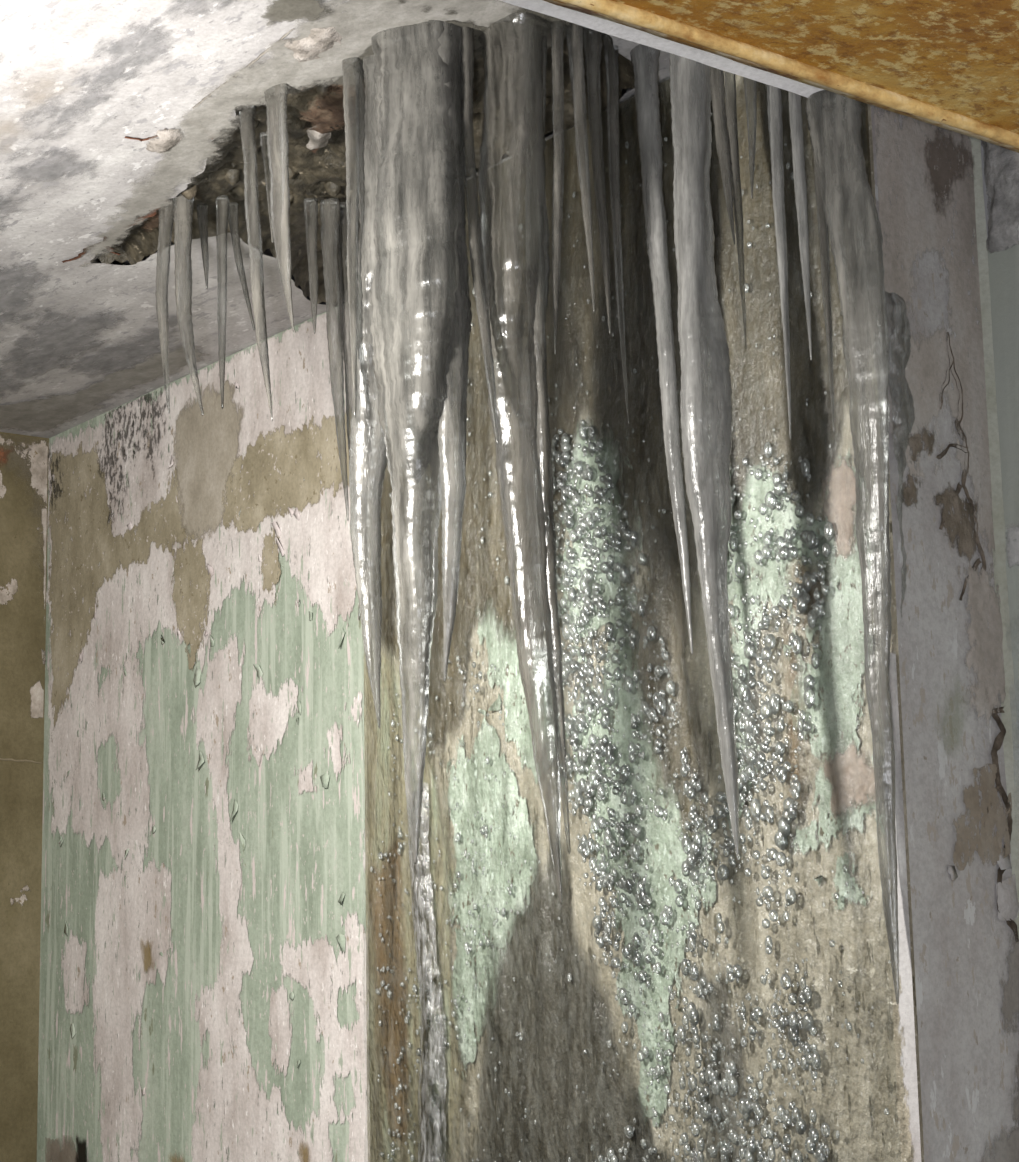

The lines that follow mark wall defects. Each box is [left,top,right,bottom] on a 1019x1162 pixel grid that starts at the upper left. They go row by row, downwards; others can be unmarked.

damp [80,0,578,267]
spalling [457,23,634,177]
damp [861,102,872,191]
damp [363,93,710,841]
damp [696,77,863,517]
flaking render [874,110,1019,725]
crack [936,332,987,601]
flaking render [0,80,370,1162]
flaking render [947,763,1012,881]
crack [984,707,1019,942]
damp [463,840,670,1162]
damp [685,974,739,1162]